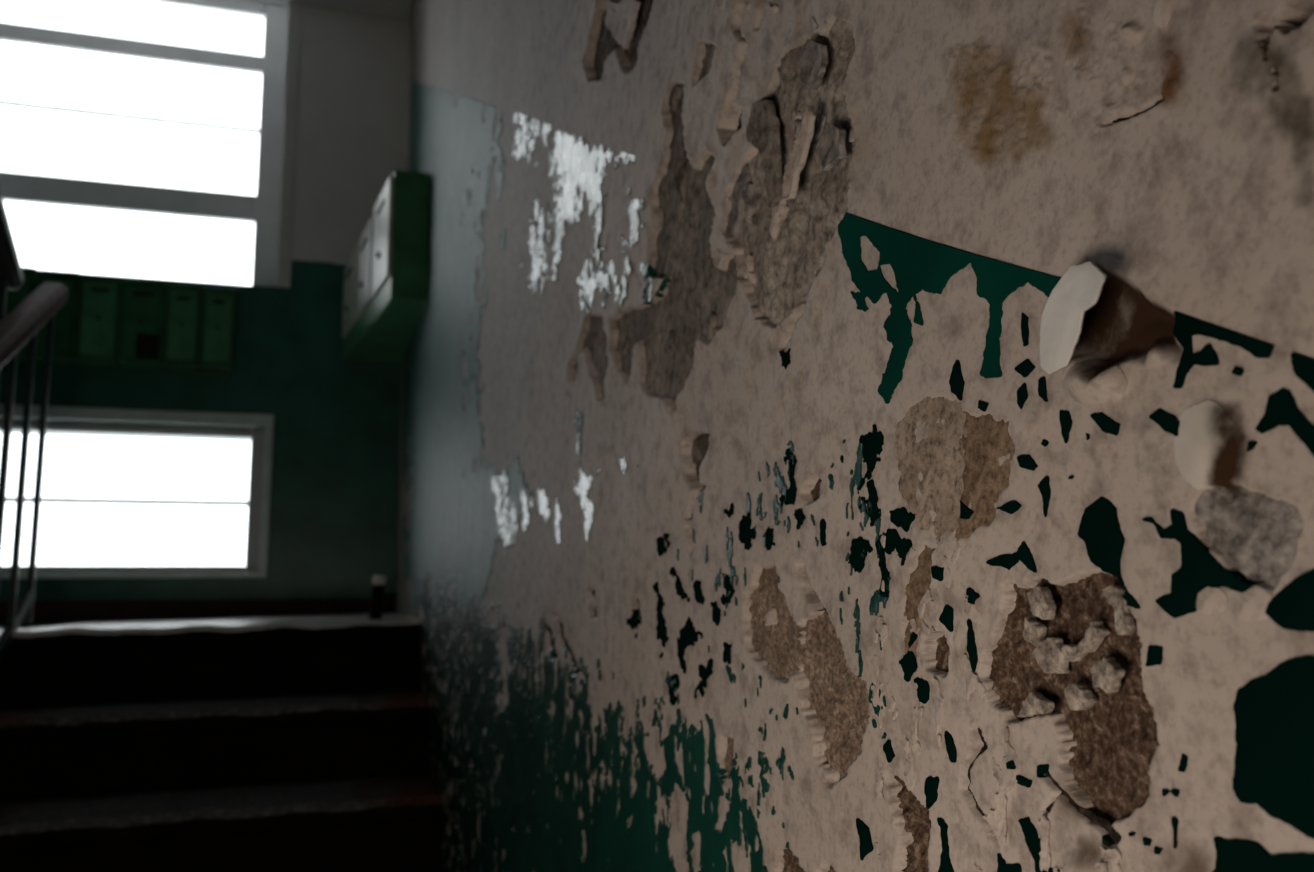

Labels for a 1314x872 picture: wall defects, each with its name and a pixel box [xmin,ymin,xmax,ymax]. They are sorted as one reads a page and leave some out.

flaking render [594,0,653,80]
peeling [402,17,1314,872]